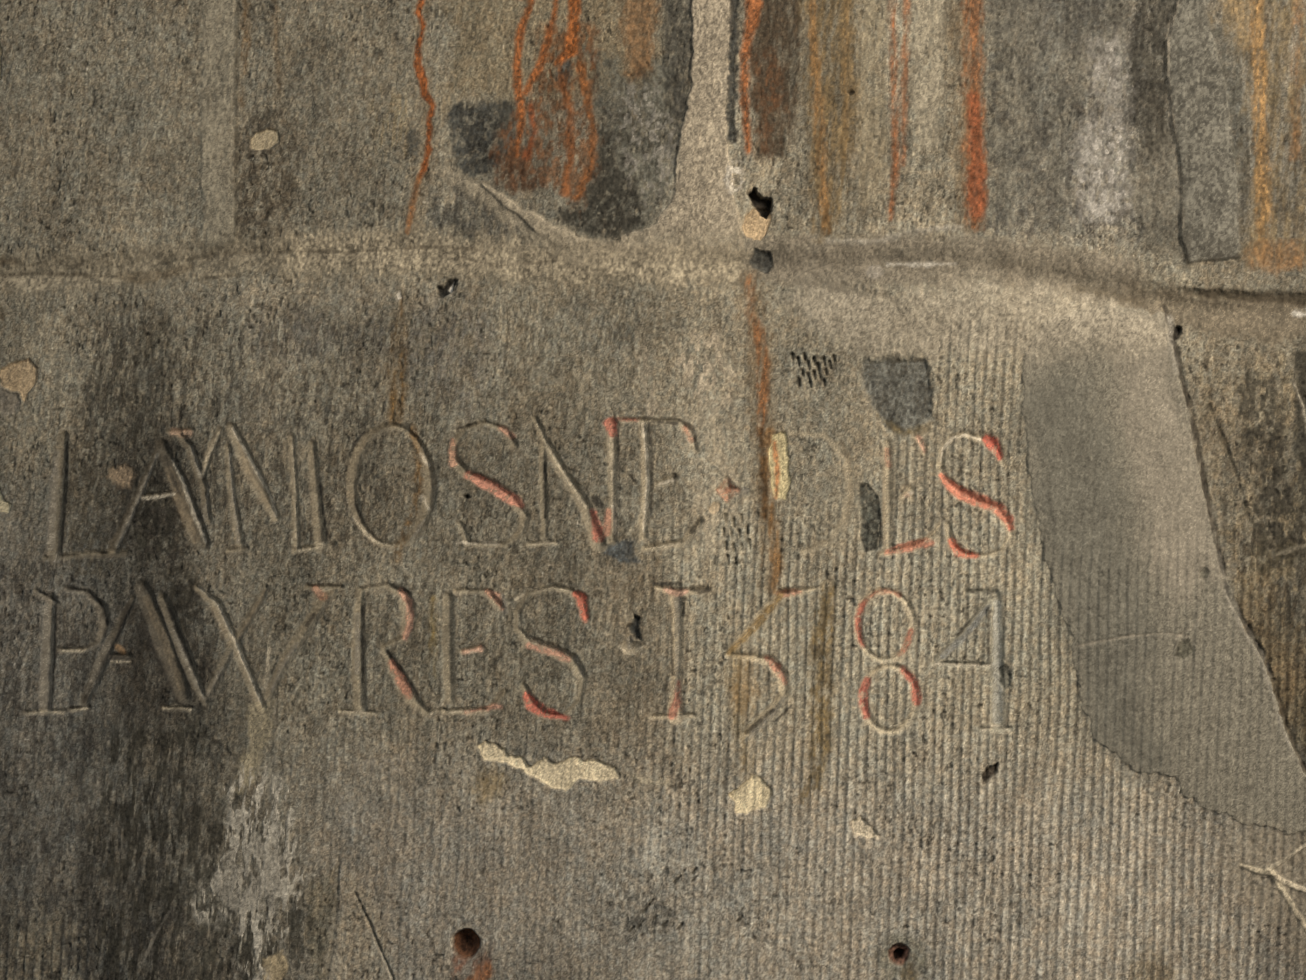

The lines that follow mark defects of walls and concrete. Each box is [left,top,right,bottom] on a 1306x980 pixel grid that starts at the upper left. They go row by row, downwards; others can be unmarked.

corrosion [407,0,434,233]
corrosion [490,0,595,199]
corrosion [964,0,986,228]
spalling [0,359,38,401]
spalling [479,742,619,790]
spalling [729,777,772,813]